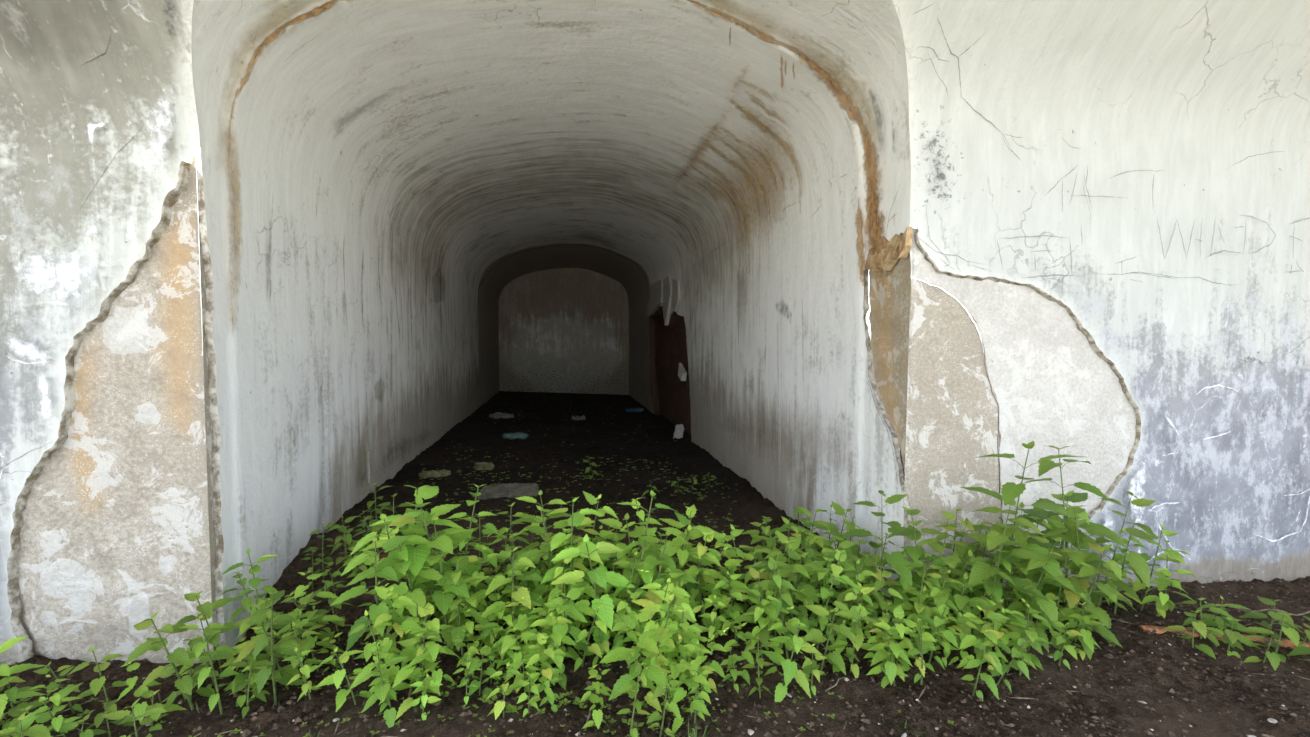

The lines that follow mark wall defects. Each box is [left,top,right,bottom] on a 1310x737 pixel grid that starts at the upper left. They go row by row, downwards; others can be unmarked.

damp [87,122,105,142]
damp [149,100,171,163]
rust [225,0,337,254]
rust [679,0,886,283]
damp [18,252,105,312]
damp [7,339,52,417]
flaking render [7,148,225,664]
flaking render [863,226,1141,582]
damp [1129,467,1146,530]